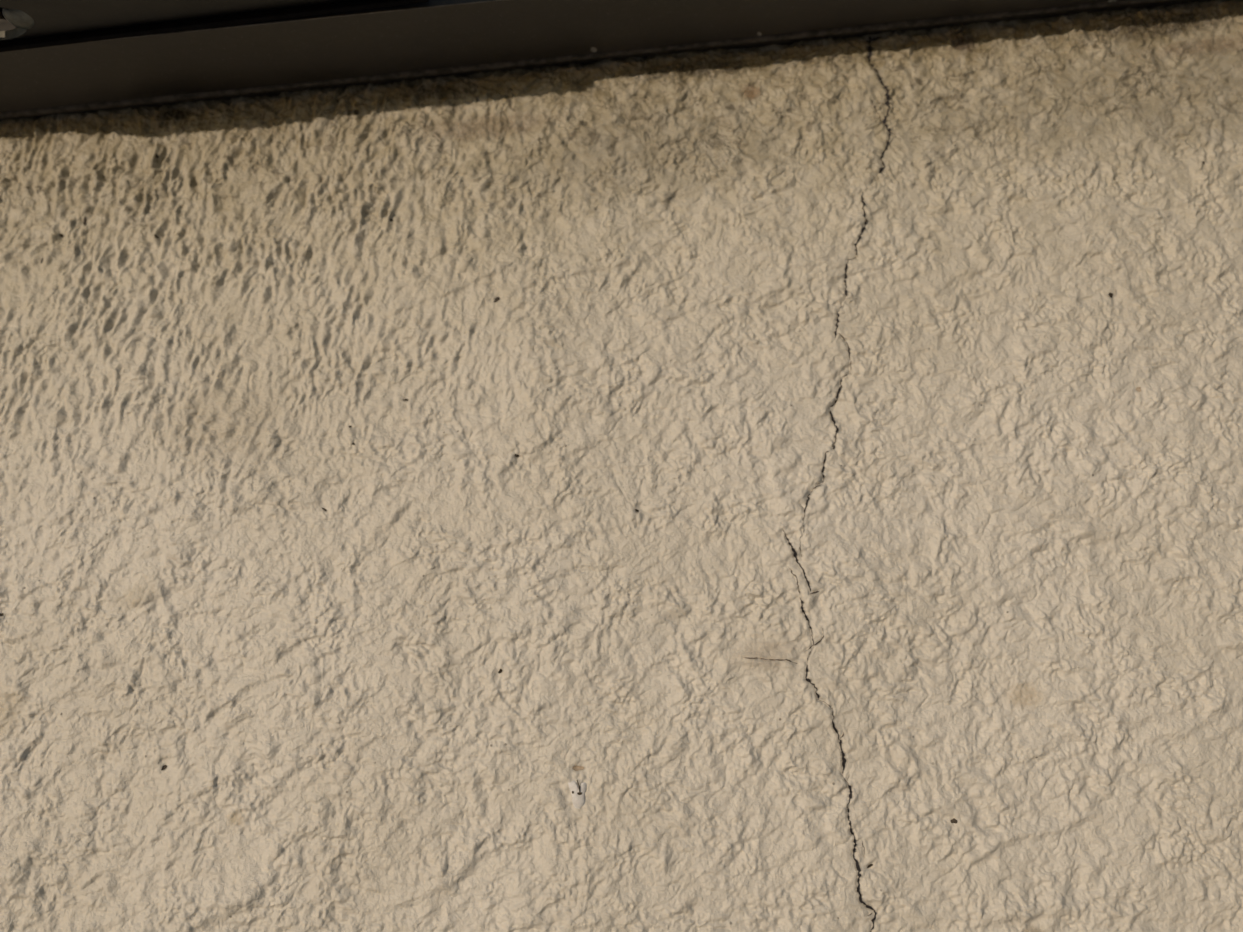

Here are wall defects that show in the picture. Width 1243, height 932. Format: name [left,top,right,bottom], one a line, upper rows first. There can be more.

crack [744,36,895,932]